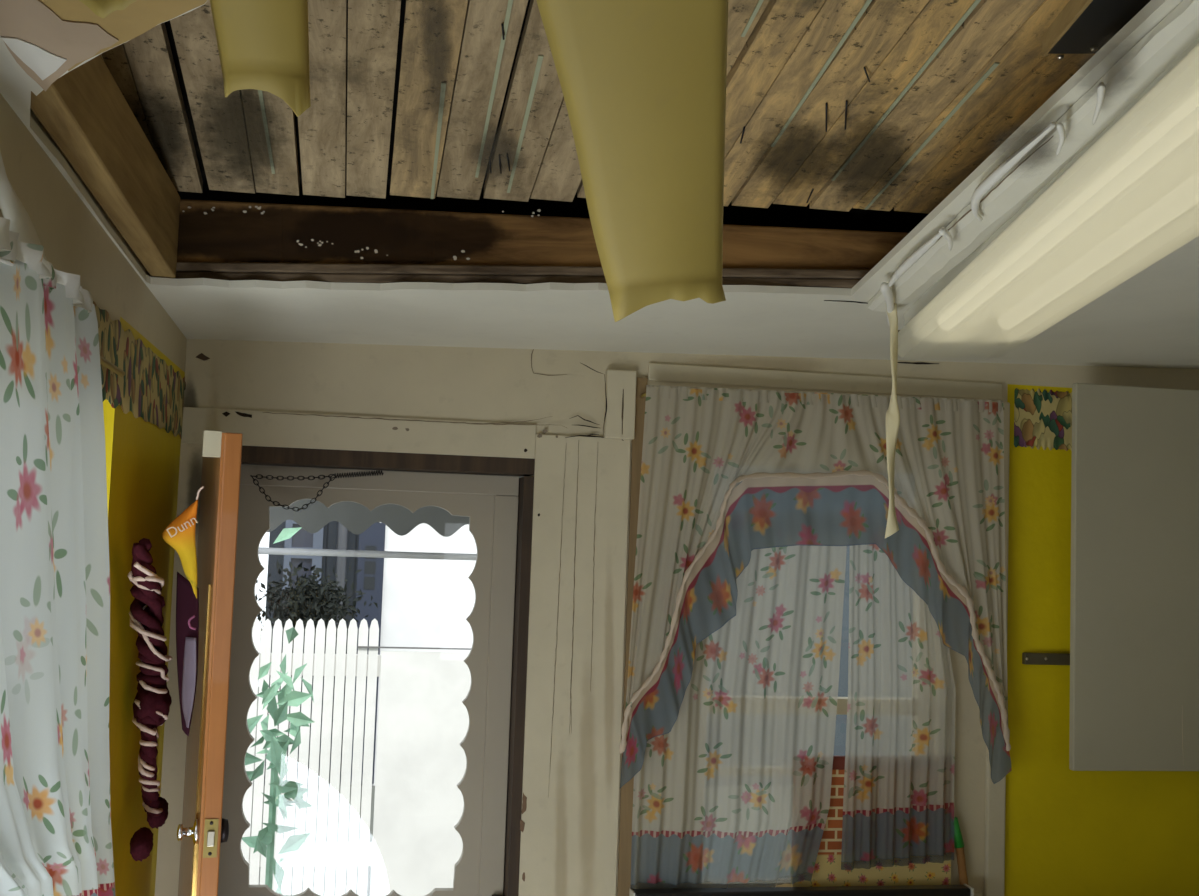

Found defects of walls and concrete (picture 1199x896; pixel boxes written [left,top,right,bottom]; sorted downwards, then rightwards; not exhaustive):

peeling [0,0,207,92]
damp [424,2,447,85]
peeling [0,151,47,261]
damp [177,207,503,264]
spalling [174,272,606,284]
spalling [722,278,861,288]
damp [762,128,904,197]
peeling [888,233,942,287]
peeling [971,122,1056,221]